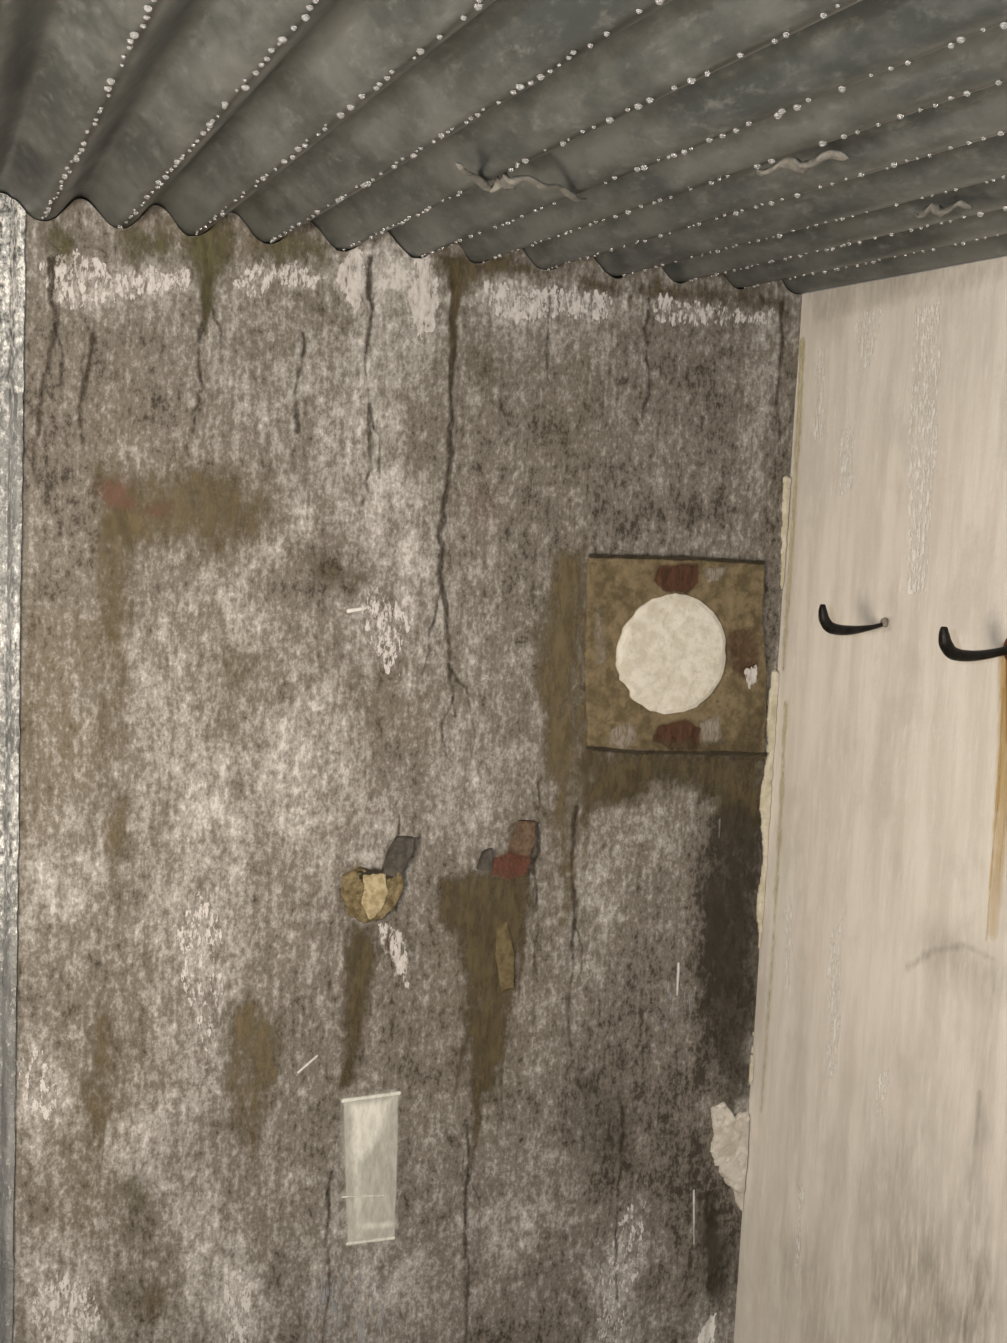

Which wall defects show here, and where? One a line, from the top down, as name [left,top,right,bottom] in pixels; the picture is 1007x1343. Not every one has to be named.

crack [32,257,95,472]
crack [194,281,214,411]
crack [294,333,306,429]
crack [364,256,373,360]
crack [362,404,375,502]
crack [429,258,462,717]
rust [995,655,1007,857]
water stain [340,924,389,1087]
spalling [341,866,409,989]
water stain [439,872,529,1159]
crack [463,1125,474,1332]
peeling [733,1190,744,1211]